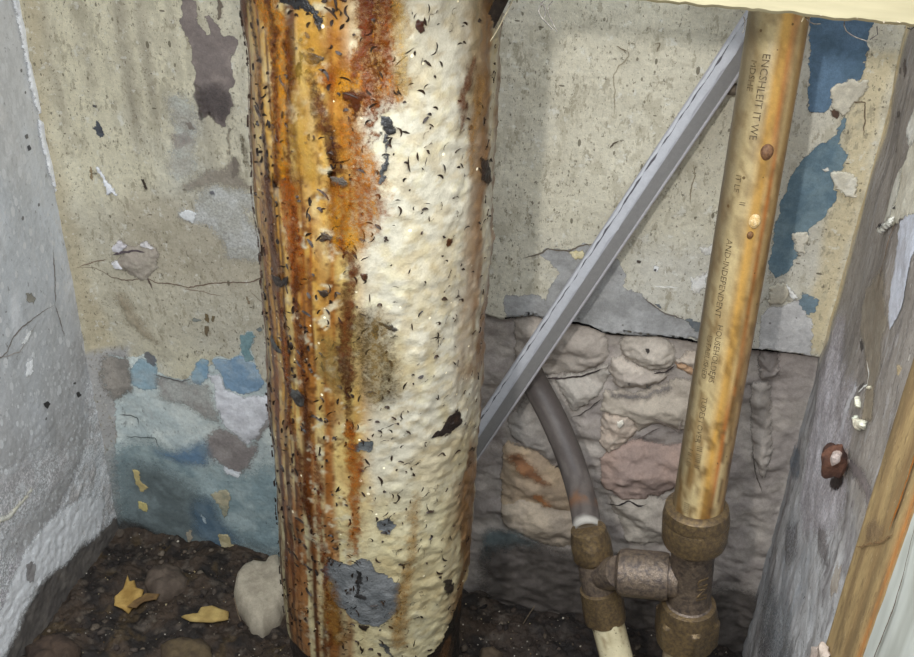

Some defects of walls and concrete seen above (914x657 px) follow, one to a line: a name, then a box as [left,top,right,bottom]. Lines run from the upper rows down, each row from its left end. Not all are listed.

corrosion [458,57,485,168]
crack [0,253,64,358]
crack [78,260,262,302]
peeling [58,327,282,557]
peeling [192,314,215,336]
corrosion [240,0,409,655]
peeling [322,558,401,631]
spalling [443,392,573,596]
spalling [481,243,590,412]
spalling [540,259,700,556]
spalling [712,17,874,596]
peeling [876,109,914,330]